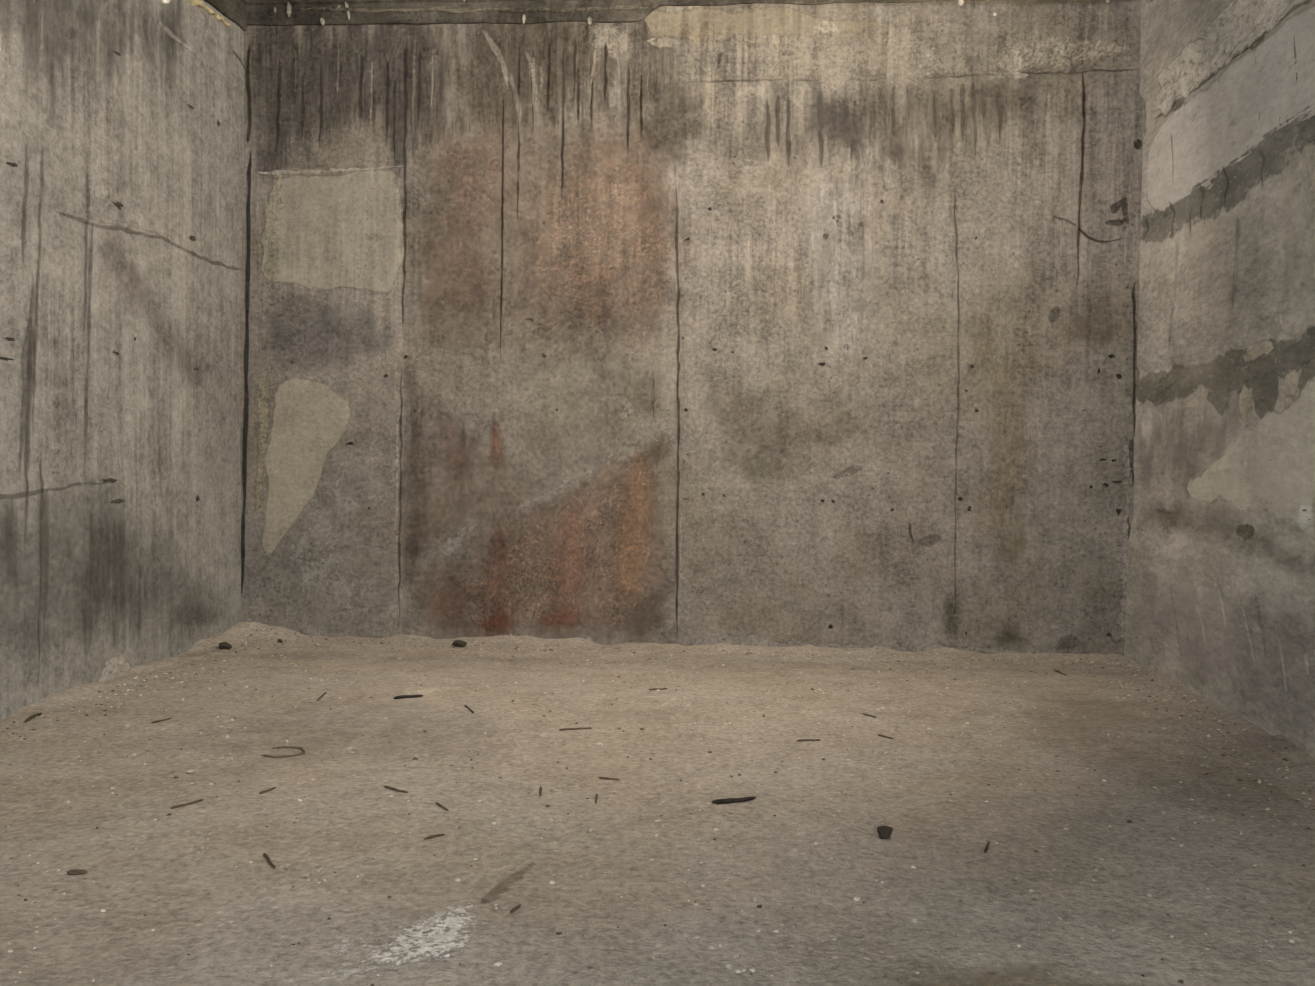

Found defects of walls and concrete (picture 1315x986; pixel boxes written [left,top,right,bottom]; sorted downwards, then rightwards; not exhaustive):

damp [26,0,181,103]
damp [250,0,696,215]
damp [765,97,791,162]
damp [890,83,1002,176]
peeling [1106,0,1315,242]
damp [22,148,44,310]
damp [85,229,93,309]
peeling [258,165,404,293]
damp [5,329,44,595]
peeling [255,361,354,556]
spalling [1089,439,1134,643]
peeling [1135,327,1315,547]